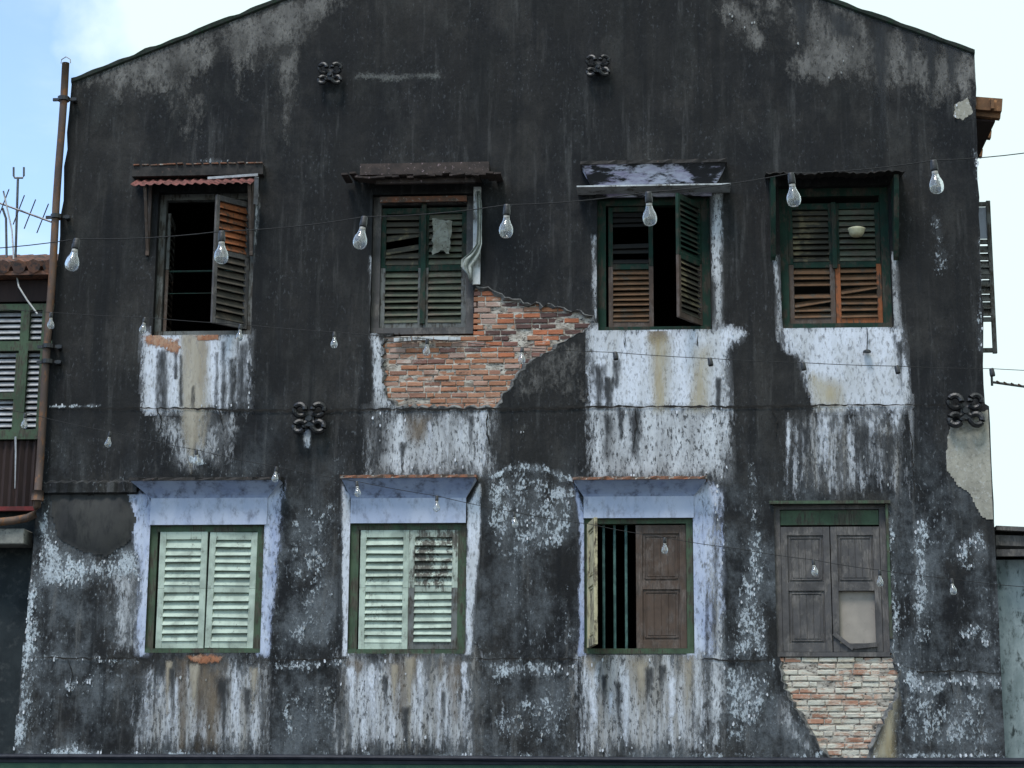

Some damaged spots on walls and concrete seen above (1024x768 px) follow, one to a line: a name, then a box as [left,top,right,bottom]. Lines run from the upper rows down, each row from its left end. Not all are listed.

damp [754,0,976,117]
damp [182,335,208,456]
peeling [134,193,1002,758]